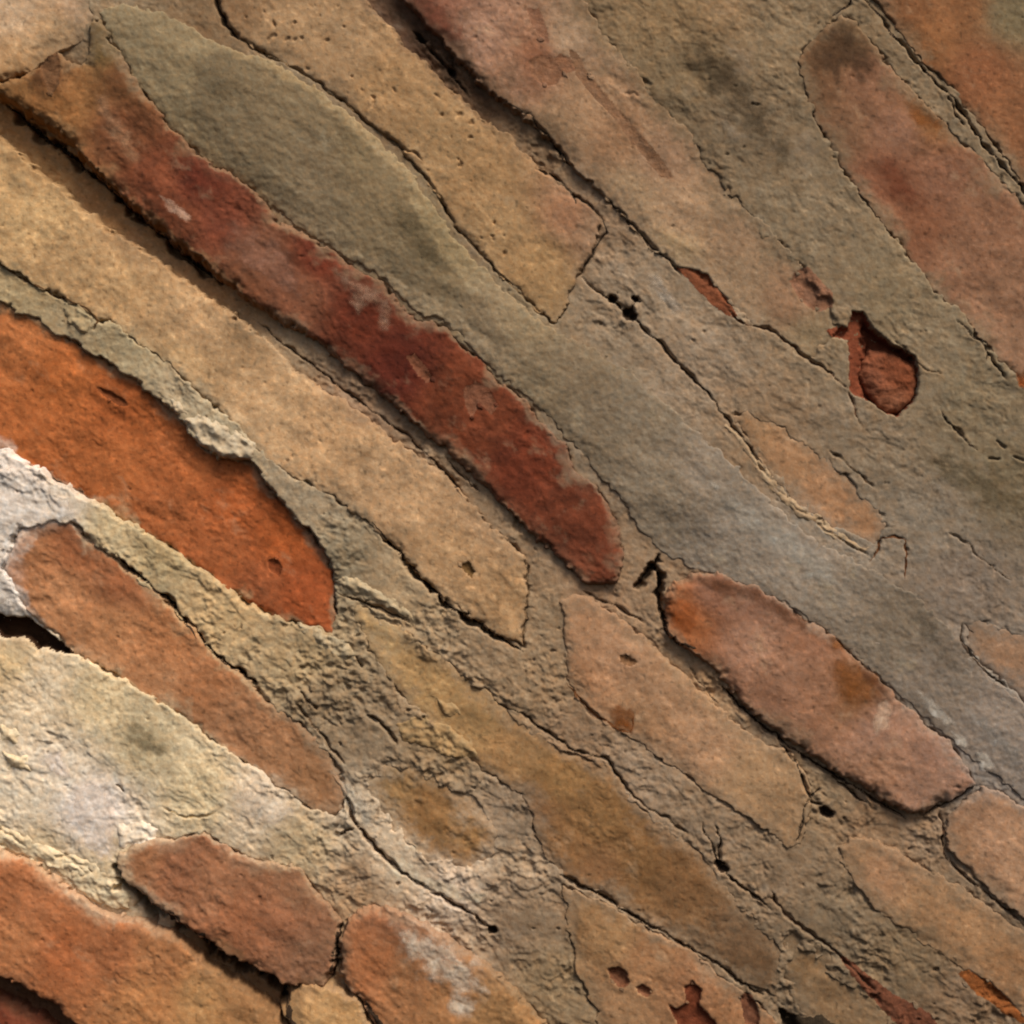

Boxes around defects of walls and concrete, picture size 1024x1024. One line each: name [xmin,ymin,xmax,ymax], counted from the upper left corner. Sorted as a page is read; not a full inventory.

spalling [677,267,741,320]
spalling [669,981,716,1024]
spalling [738,992,760,1024]